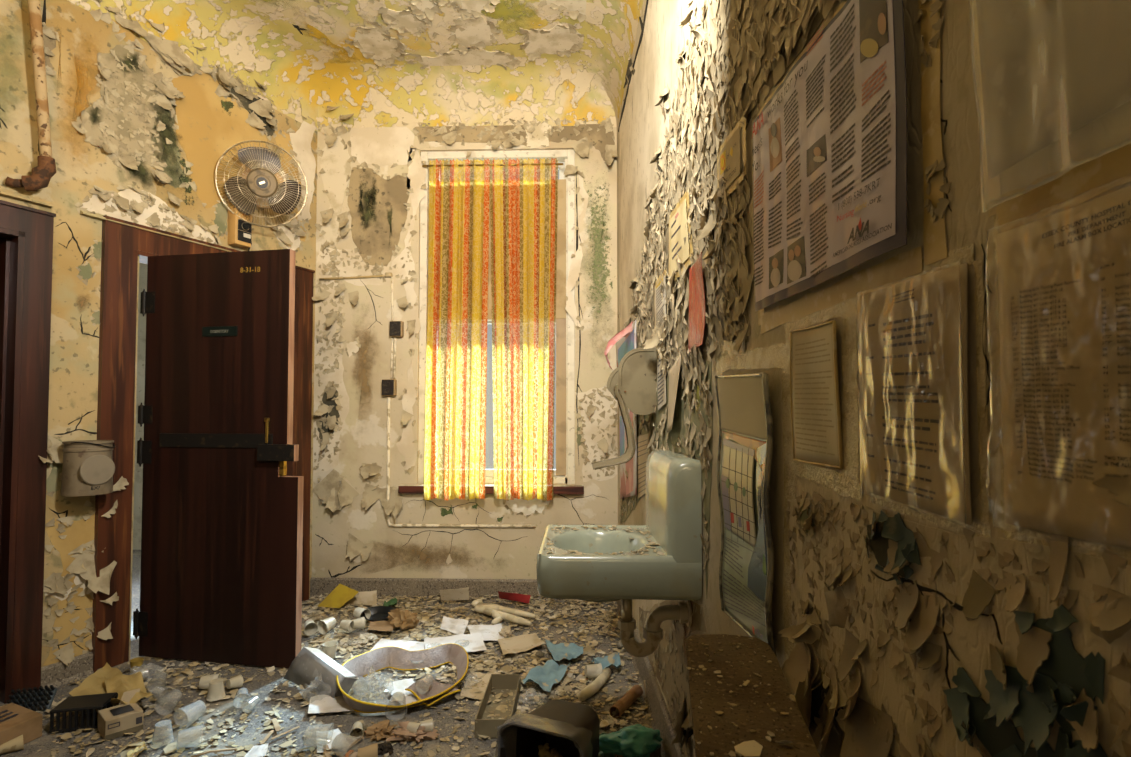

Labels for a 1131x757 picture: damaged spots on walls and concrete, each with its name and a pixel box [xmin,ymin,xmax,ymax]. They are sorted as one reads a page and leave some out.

crack [55,222,91,264]
water stain [127,161,153,186]
water stain [157,107,194,205]
mould [359,189,392,233]
peeling [71,0,844,596]
mould [584,171,613,332]
peeling [38,435,64,497]
peeling [43,476,129,666]
crack [396,498,528,557]
crack [557,494,607,525]
peeling [639,491,1131,757]
crack [871,571,1002,689]